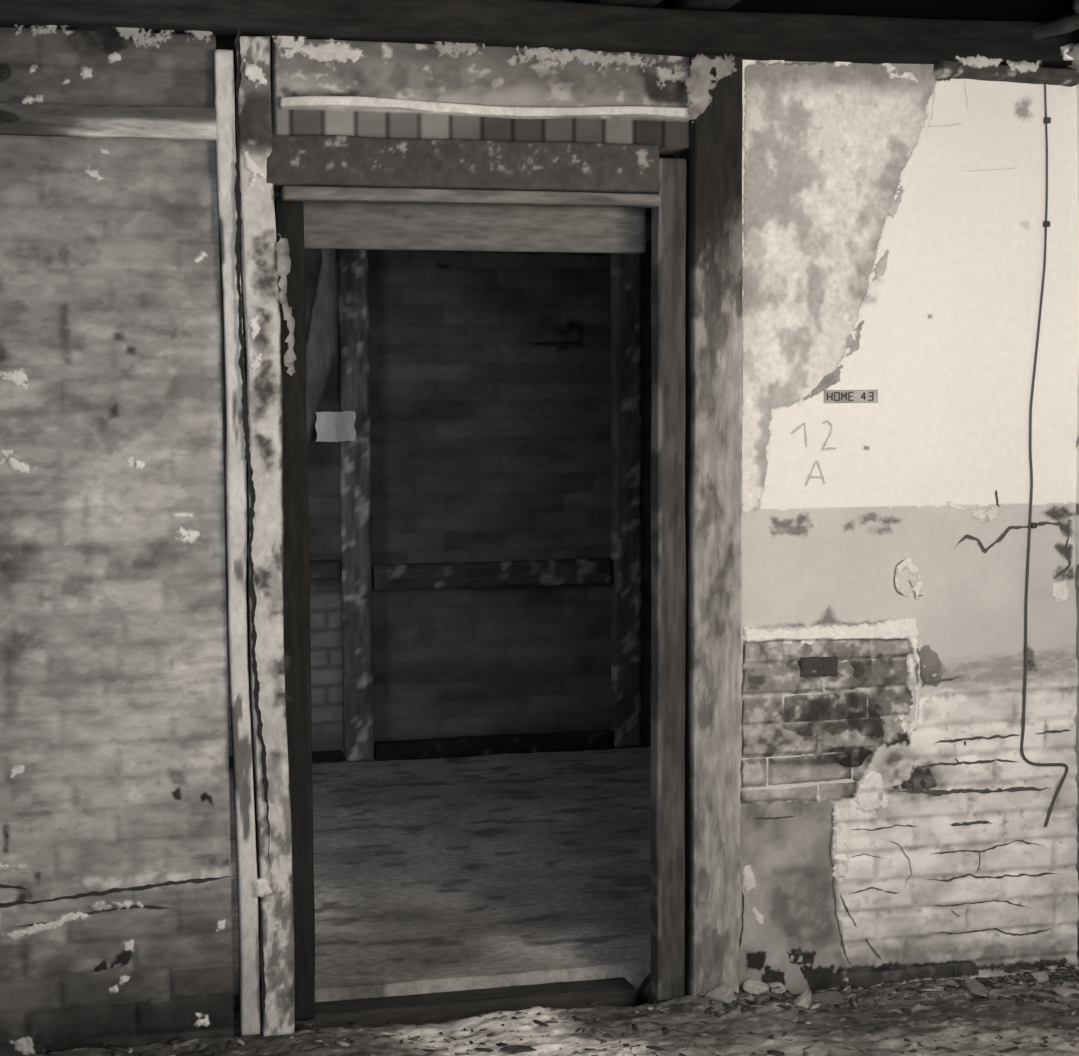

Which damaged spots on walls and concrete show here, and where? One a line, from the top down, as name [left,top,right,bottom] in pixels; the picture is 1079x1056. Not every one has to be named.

peeling [243,59,267,84]
flaking render [272,36,363,63]
flaking render [22,95,43,104]
flaking render [686,55,950,513]
peeling [249,308,275,416]
peeling [257,434,272,468]
crack [954,490,1071,579]
flaking render [1052,514,1079,604]
flaking render [741,637,943,880]
peeling [254,879,272,897]
flaking render [742,865,756,892]
spalling [746,948,1067,993]